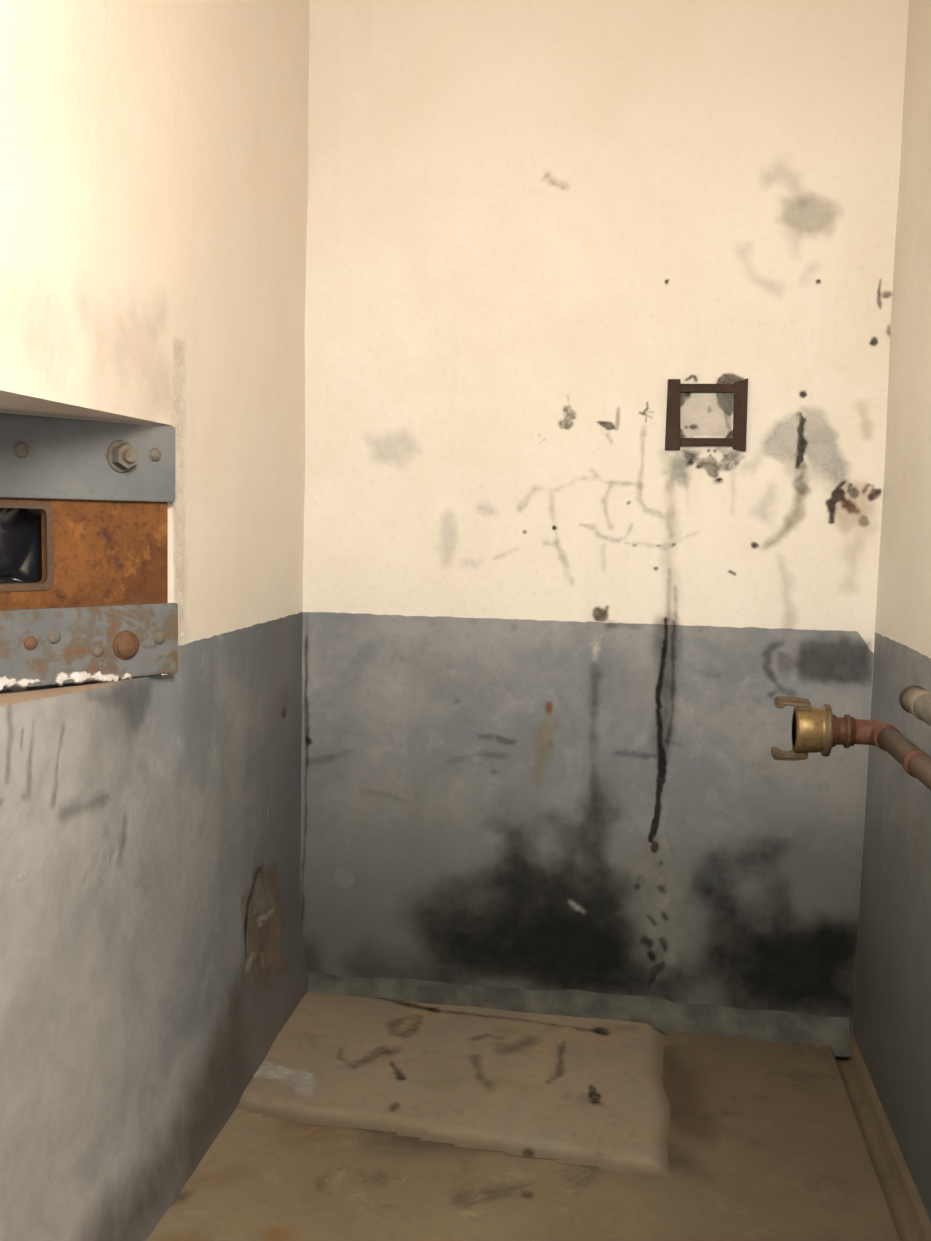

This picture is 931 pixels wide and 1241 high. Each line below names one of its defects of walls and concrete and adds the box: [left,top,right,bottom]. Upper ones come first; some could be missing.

crack [796,413,807,495]
crack [648,618,675,852]
water stain [433,805,628,990]
water stain [710,897,854,1008]